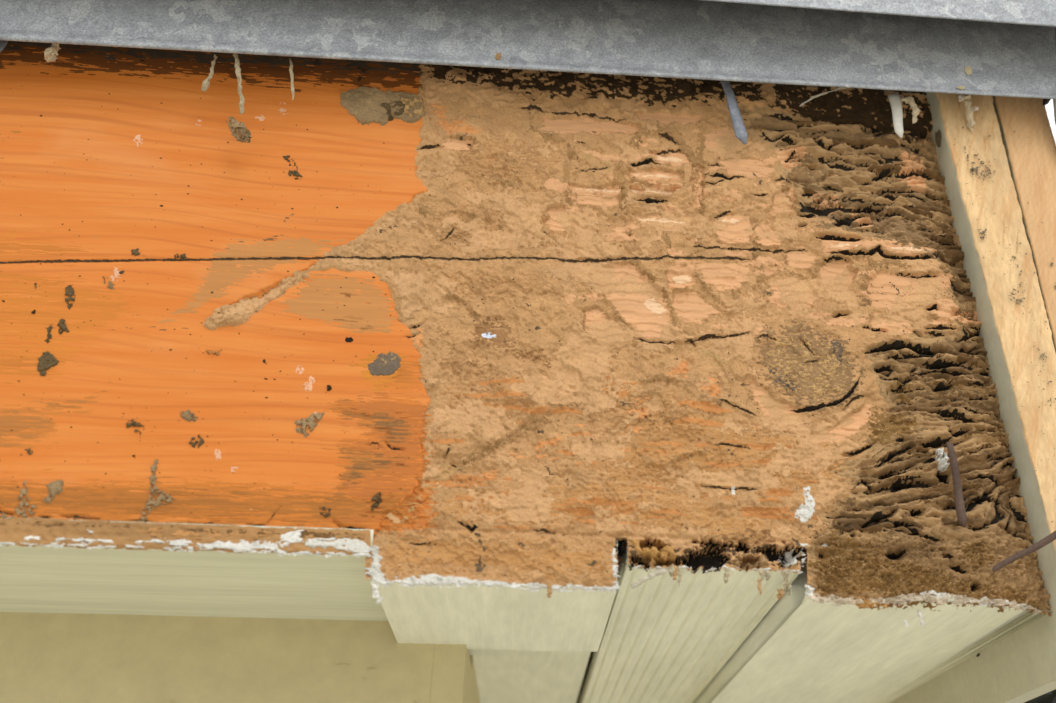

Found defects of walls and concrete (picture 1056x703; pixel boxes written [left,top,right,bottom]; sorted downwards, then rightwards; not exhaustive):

peeling [441,139,474,153]
crack [0,104,1032,591]
peeling [539,109,1028,541]